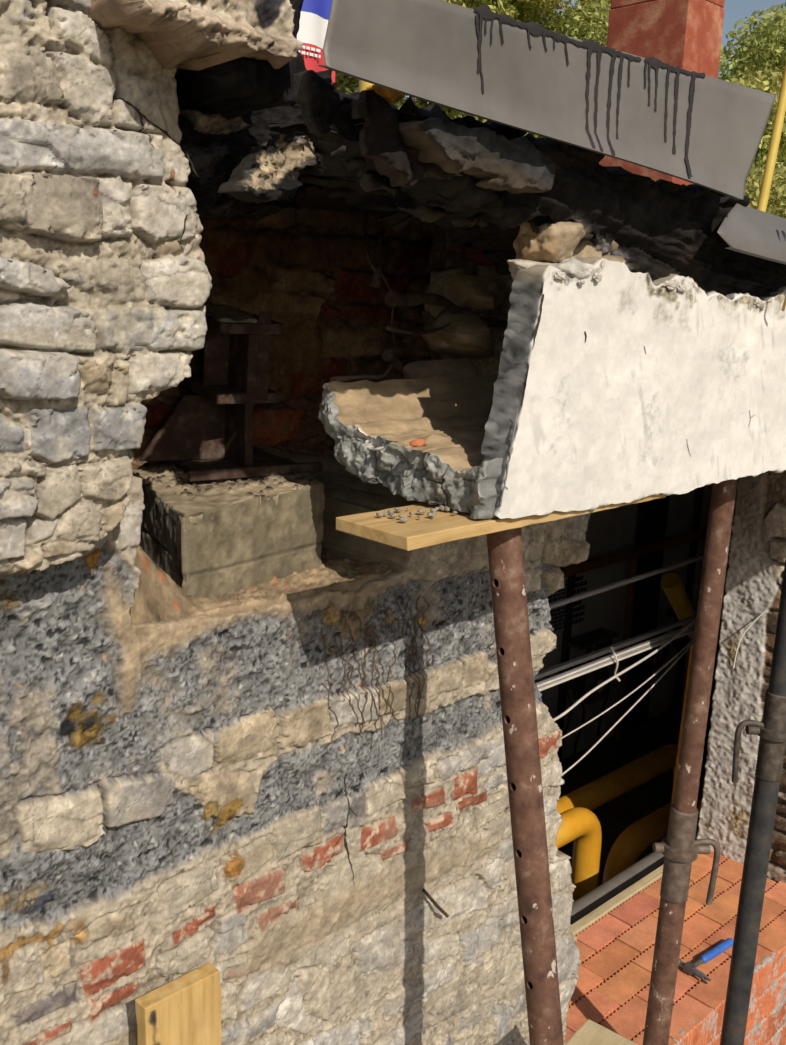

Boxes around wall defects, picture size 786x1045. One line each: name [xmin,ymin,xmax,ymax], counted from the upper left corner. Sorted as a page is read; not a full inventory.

spalling [189,349,203,374]
spalling [199,208,435,455]
spalling [131,384,199,470]
crack [334,775,357,887]